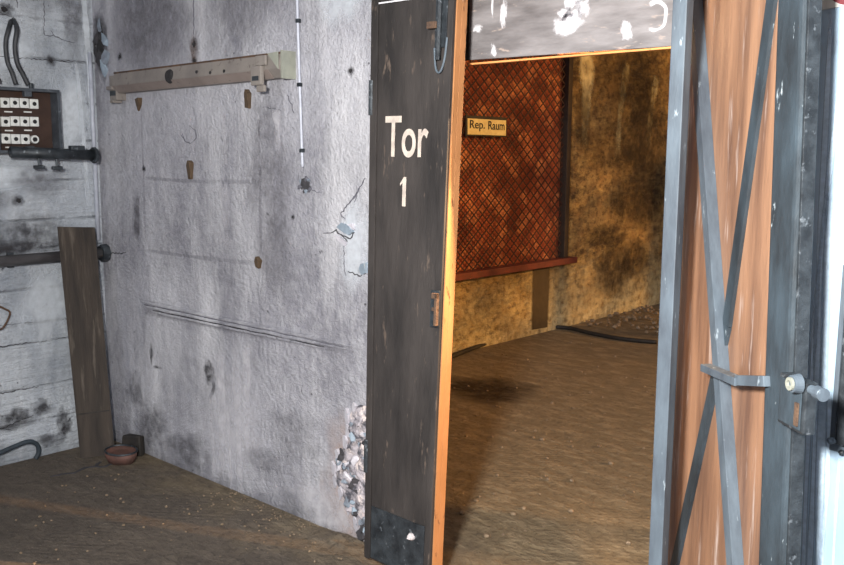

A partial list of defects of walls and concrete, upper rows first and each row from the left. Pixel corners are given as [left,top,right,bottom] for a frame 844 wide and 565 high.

leakage [581,53,593,112]
crack [340,178,365,219]
leakage [601,243,644,291]
spalling [331,402,366,541]